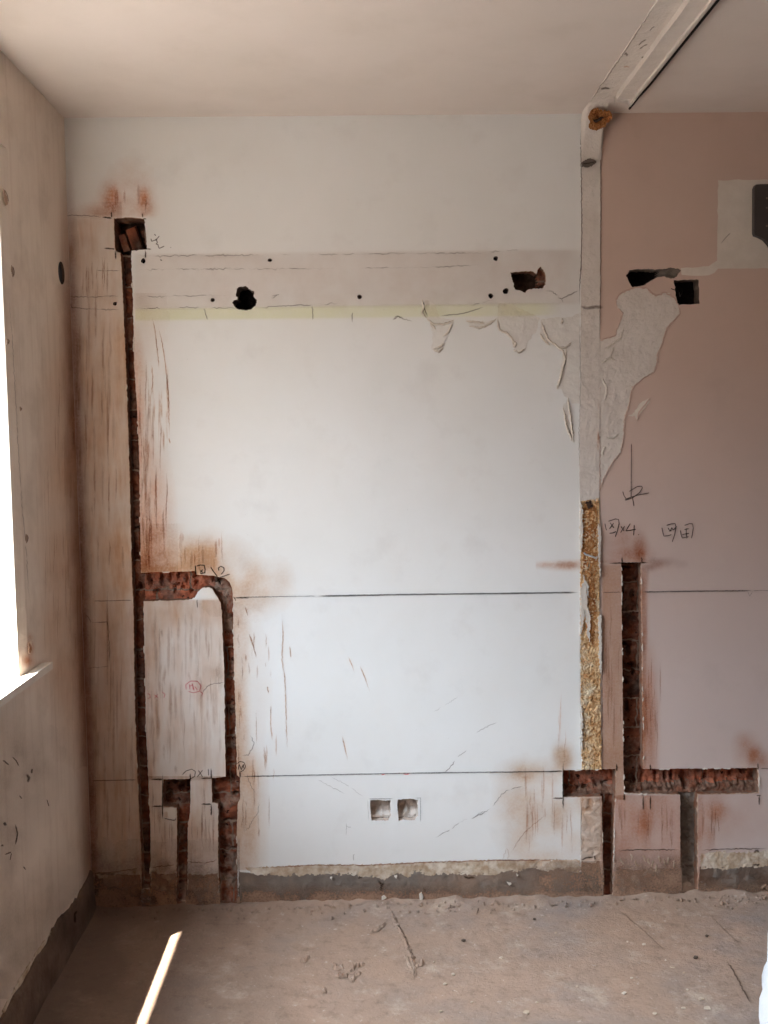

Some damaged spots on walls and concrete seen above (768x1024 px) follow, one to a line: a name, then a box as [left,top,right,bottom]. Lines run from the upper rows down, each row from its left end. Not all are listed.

peeling [585,267,681,509]
crack [369,911,424,977]